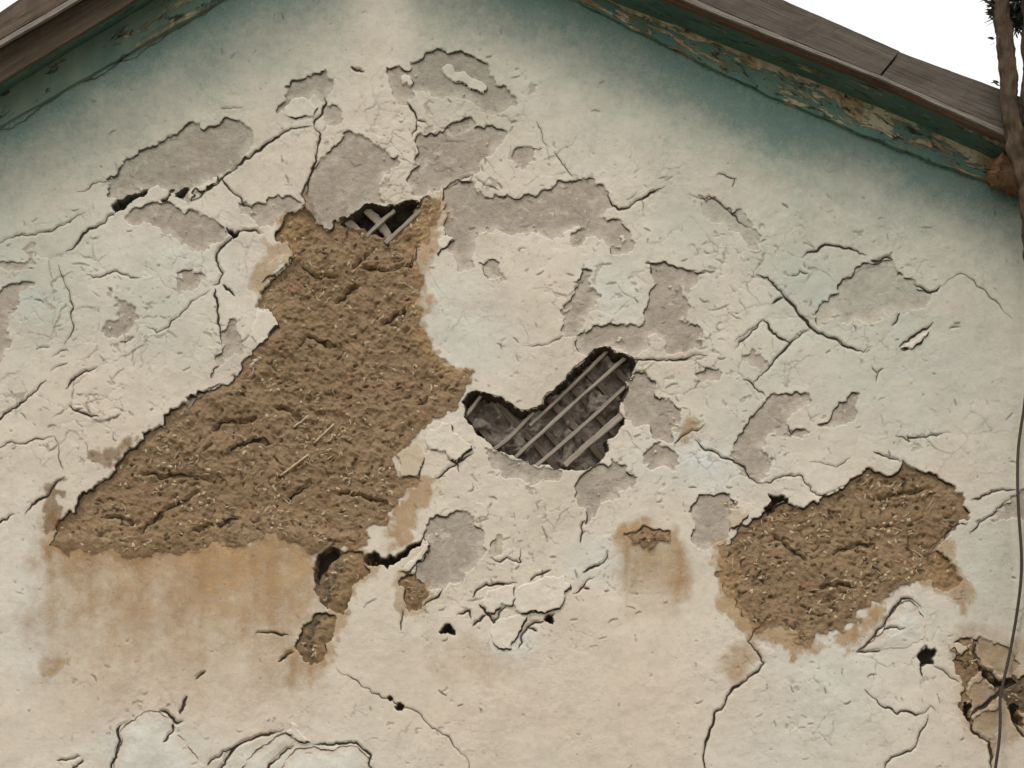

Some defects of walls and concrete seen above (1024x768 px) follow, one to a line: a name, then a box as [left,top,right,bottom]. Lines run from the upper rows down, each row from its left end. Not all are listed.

flaking render [106,117,253,252]
crack [120,98,327,343]
flaking render [238,69,399,231]
flaking render [386,48,634,282]
crack [0,181,140,523]
flaking render [210,309,278,379]
flaking render [560,261,705,356]
crack [735,244,893,394]
damp [42,481,322,631]
crack [458,549,608,650]
damp [615,518,688,590]
crack [702,616,768,768]